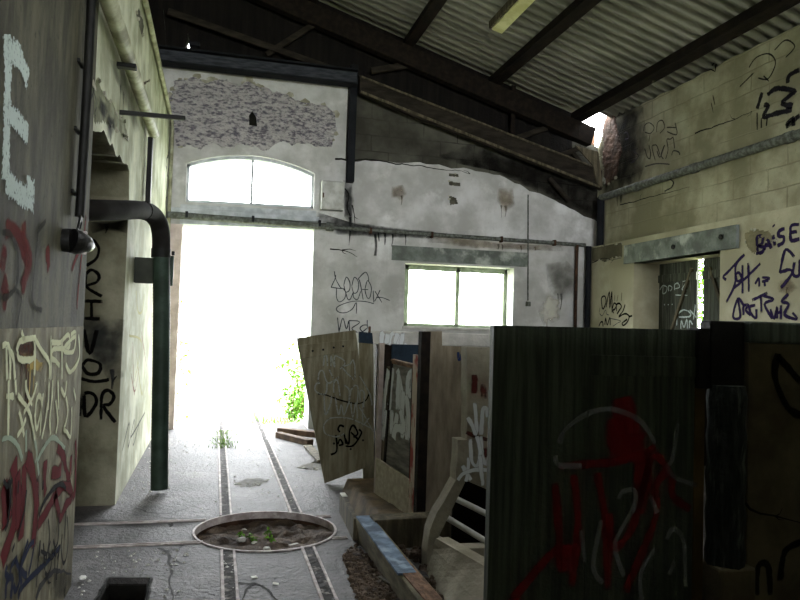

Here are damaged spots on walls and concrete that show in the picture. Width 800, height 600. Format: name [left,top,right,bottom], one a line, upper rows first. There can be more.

peeling [92,77,128,140]
spalling [168,73,340,151]
spalling [602,115,622,186]